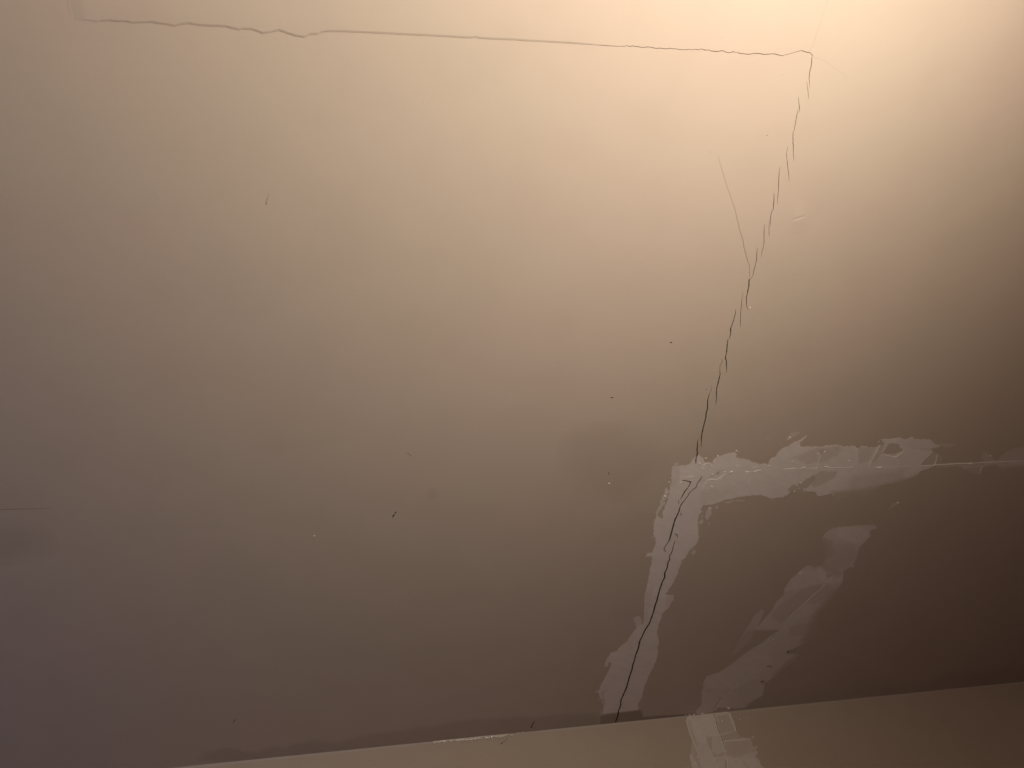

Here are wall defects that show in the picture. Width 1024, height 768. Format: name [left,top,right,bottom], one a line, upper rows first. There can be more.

crack [67,0,848,722]